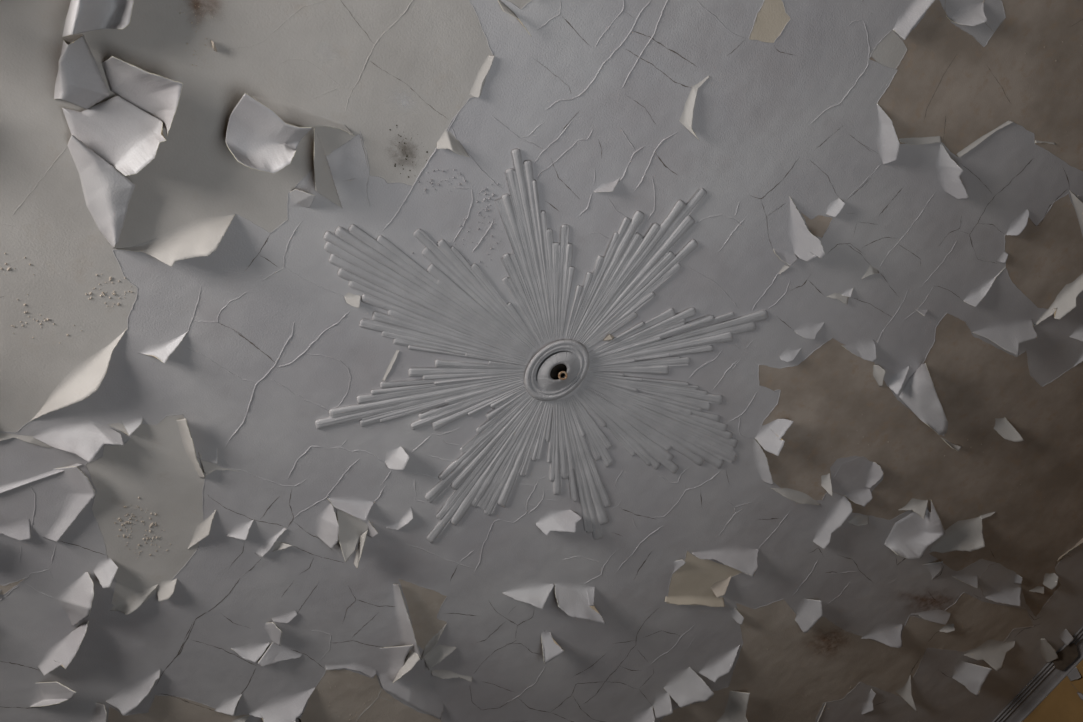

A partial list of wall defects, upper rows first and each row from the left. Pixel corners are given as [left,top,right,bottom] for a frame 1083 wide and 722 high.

crack [310,0,503,252]
crack [491,0,697,240]
peeling [594,178,620,193]
peeling [679,76,710,140]
peeling [749,0,791,43]
peeling [869,0,1083,199]
peeling [0,0,495,722]
crack [156,221,395,714]
peeling [541,629,565,664]
peeling [503,579,606,624]
peeling [536,509,582,535]
peeling [632,190,1083,722]